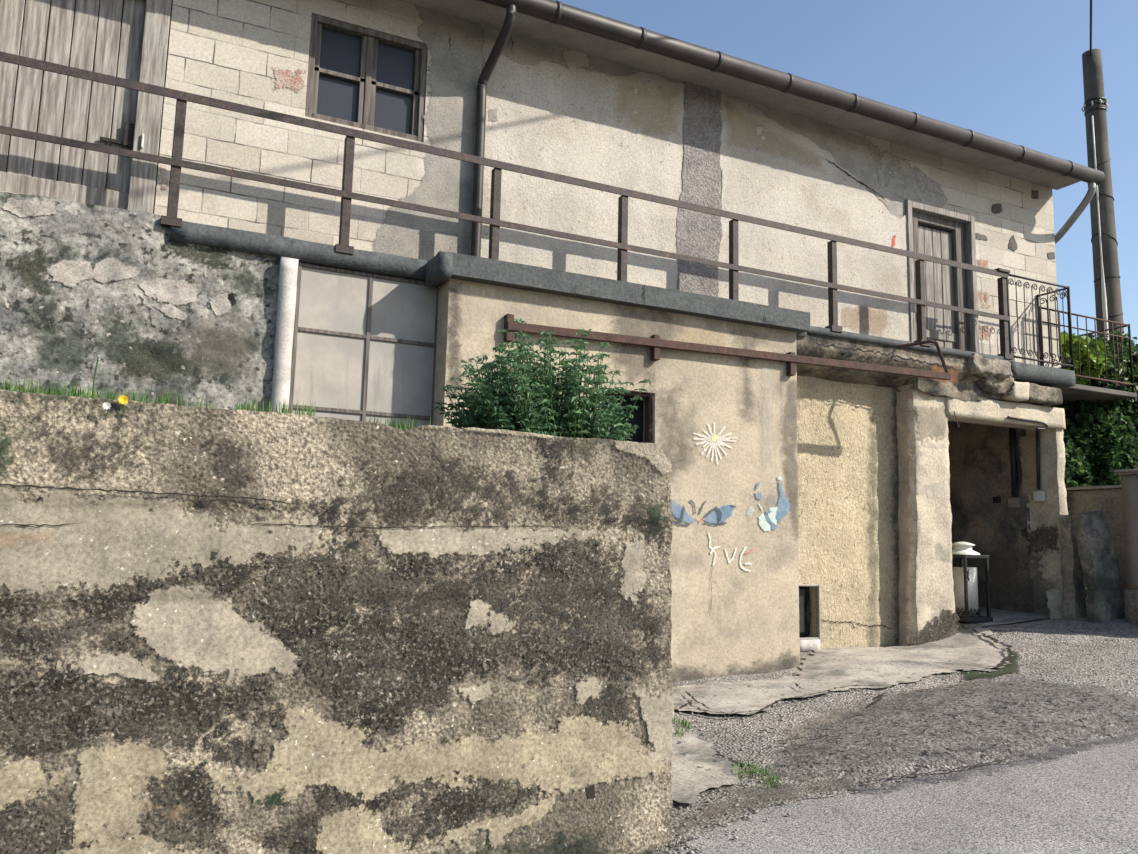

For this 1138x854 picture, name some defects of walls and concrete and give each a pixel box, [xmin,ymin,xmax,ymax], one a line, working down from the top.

flaking render [271,66,306,93]
crack [826,159,886,201]
water stain [12,242,63,303]
water stain [164,239,246,269]
water stain [616,306,765,380]
water stain [18,402,156,490]
water stain [781,381,800,523]
crack [0,484,561,529]
water stain [0,425,798,854]
crack [822,620,892,630]
crack [675,623,1099,742]
crack [715,751,753,768]